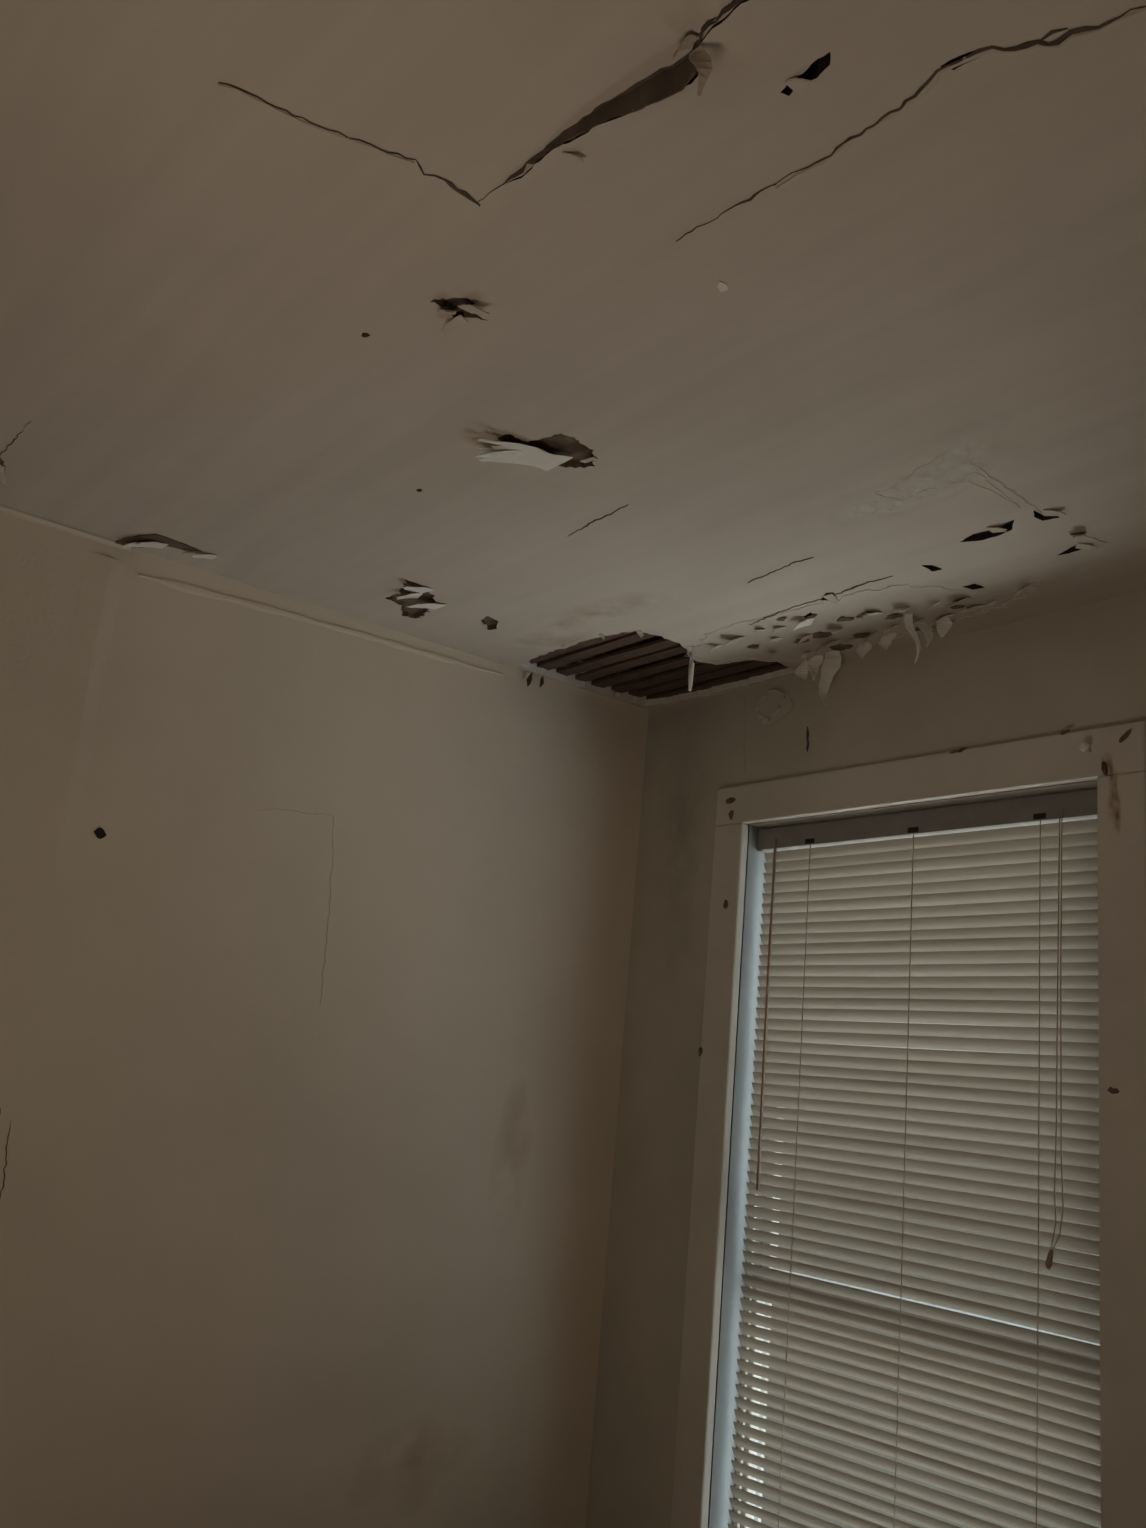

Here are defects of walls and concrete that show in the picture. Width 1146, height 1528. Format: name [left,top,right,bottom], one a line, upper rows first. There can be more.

crack [218,0,744,206]
crack [676,6,1146,242]
peeling [430,298,490,334]
peeling [473,433,598,471]
peeling [115,534,218,559]
peeling [386,580,447,619]
peeling [522,565,1047,708]
crack [0,1108,11,1198]